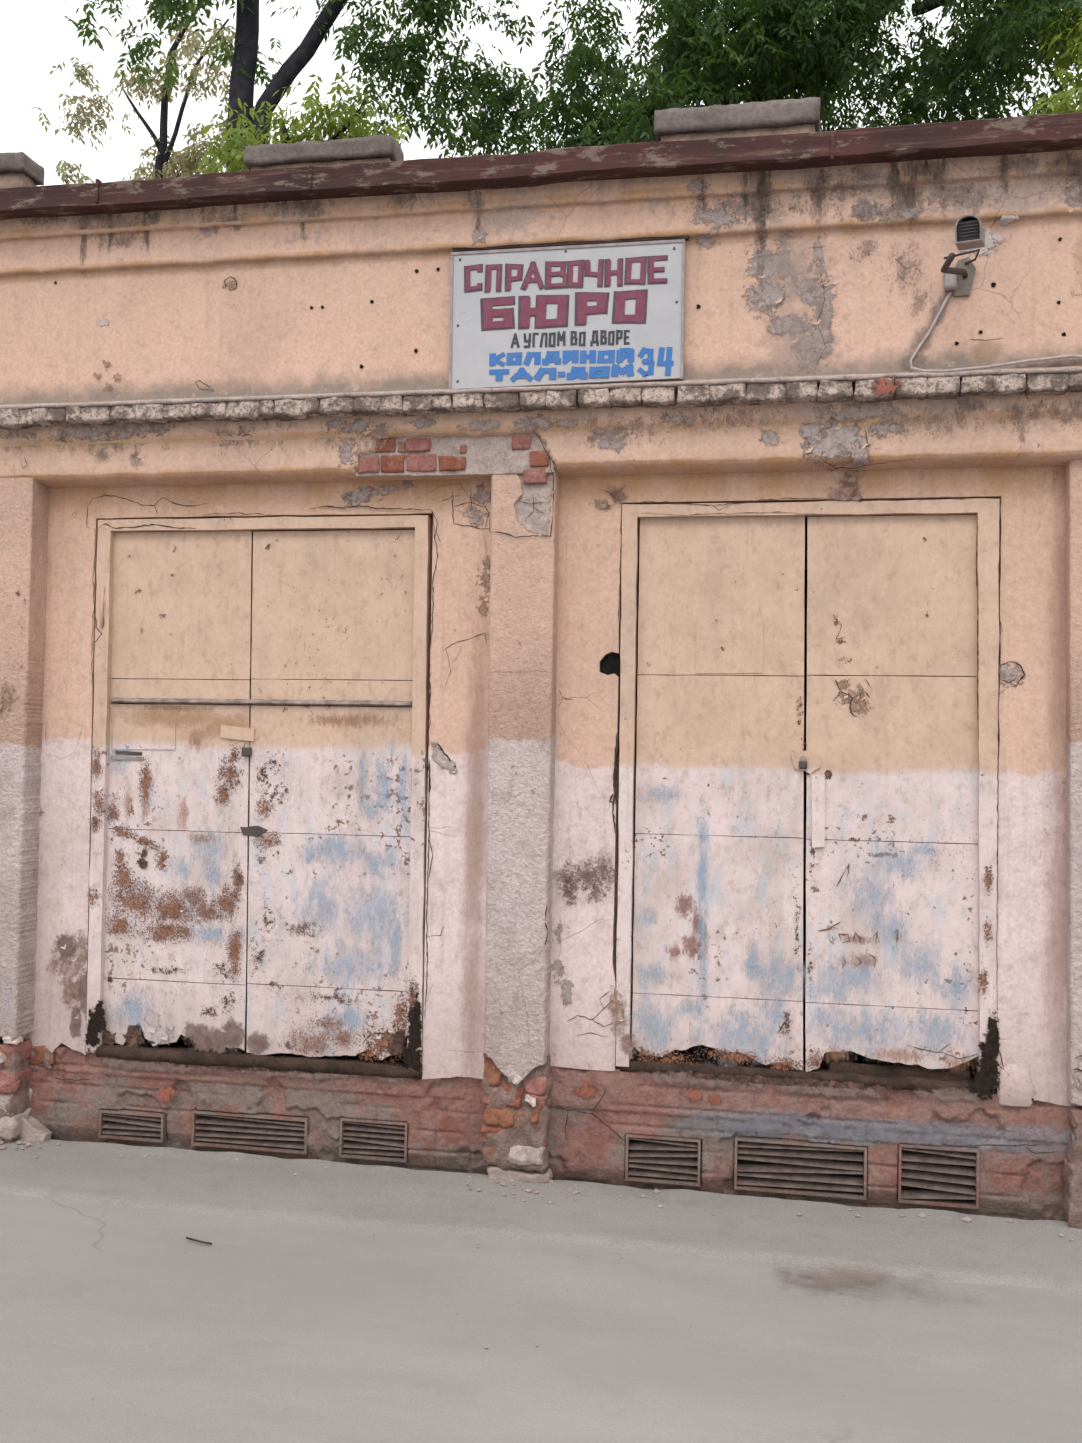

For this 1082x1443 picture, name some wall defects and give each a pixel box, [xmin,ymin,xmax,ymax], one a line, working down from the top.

damp [742,171,771,277]
peeling [686,153,1082,373]
damp [887,160,945,222]
flaking render [321,375,1082,536]
rust [85,734,423,1072]
rust [642,882,765,978]
peeling [145,1009,174,1047]
flaking render [0,1039,55,1141]
flaking render [481,1052,552,1173]
flaking render [1062,1059,1082,1229]